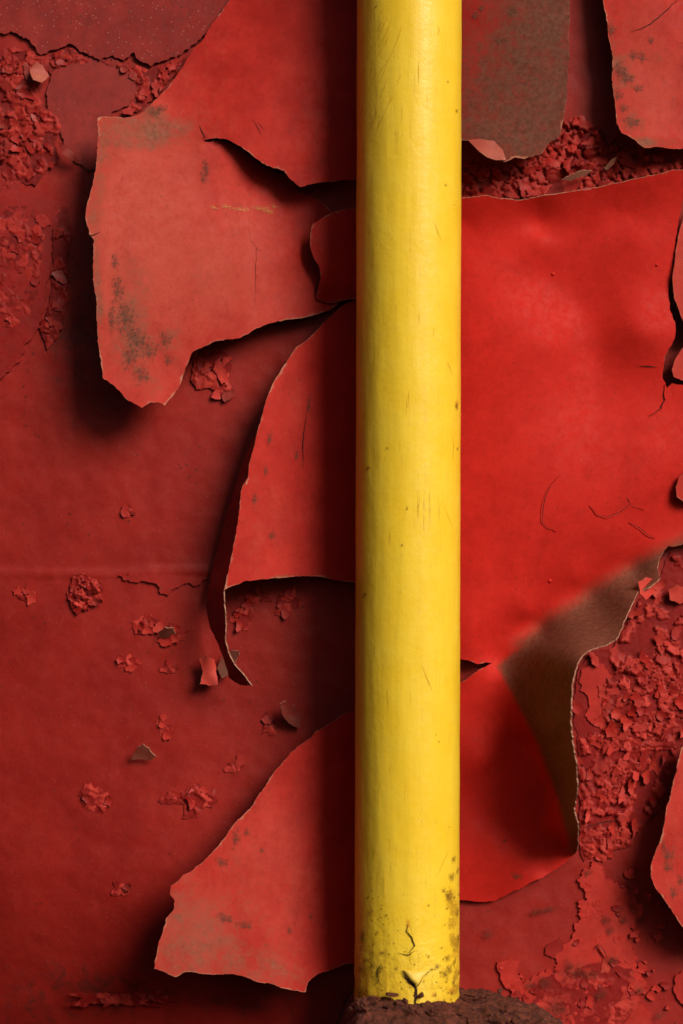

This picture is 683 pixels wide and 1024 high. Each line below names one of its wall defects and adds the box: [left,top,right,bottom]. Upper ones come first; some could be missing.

peeling [0,0,357,686]
peeling [154,711,355,992]
peeling [261,701,303,736]
peeling [459,0,683,927]